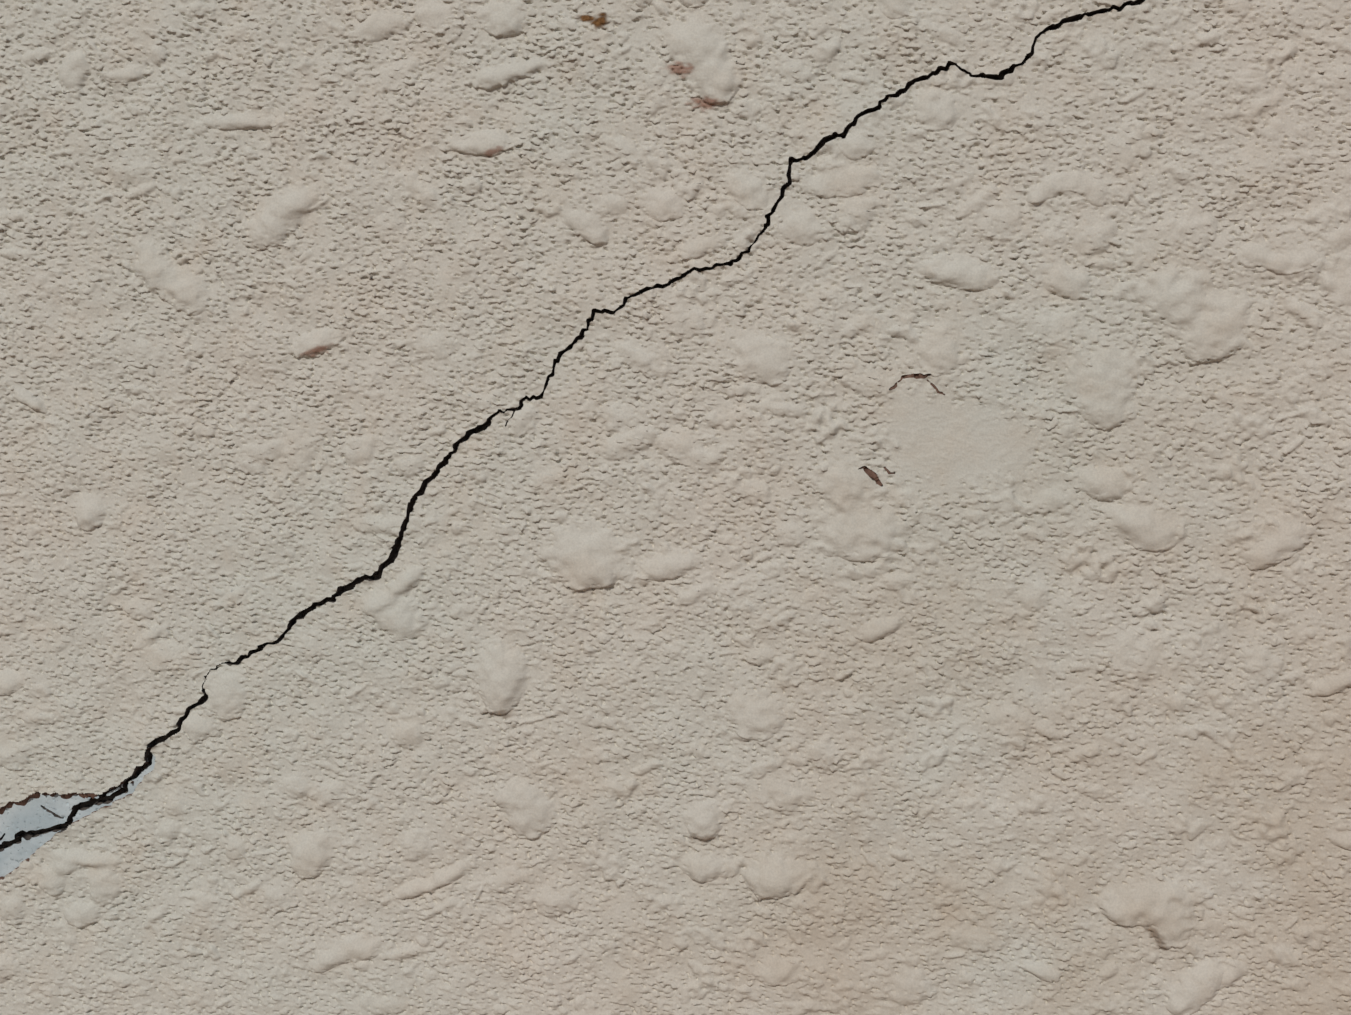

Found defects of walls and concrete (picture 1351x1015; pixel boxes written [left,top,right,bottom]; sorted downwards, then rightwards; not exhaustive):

peeling [0,755,156,880]
crack [0,0,1145,852]